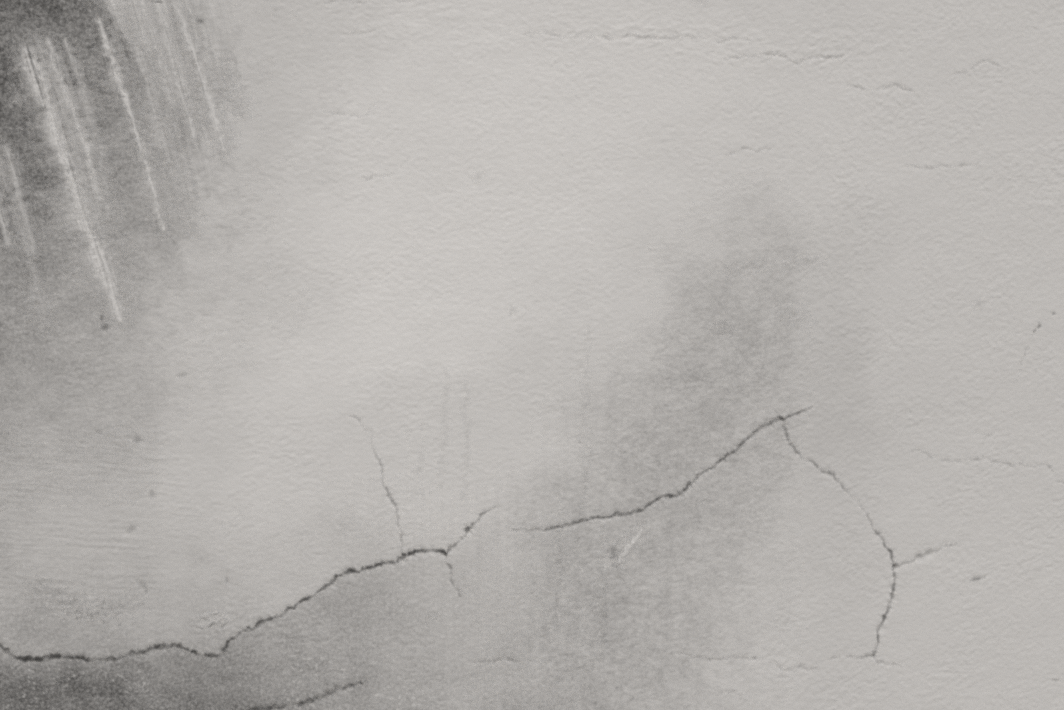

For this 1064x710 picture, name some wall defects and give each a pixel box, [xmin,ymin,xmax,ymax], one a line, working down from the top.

leakage [0,0,228,324]
crack [336,550,446,577]
crack [2,647,88,661]